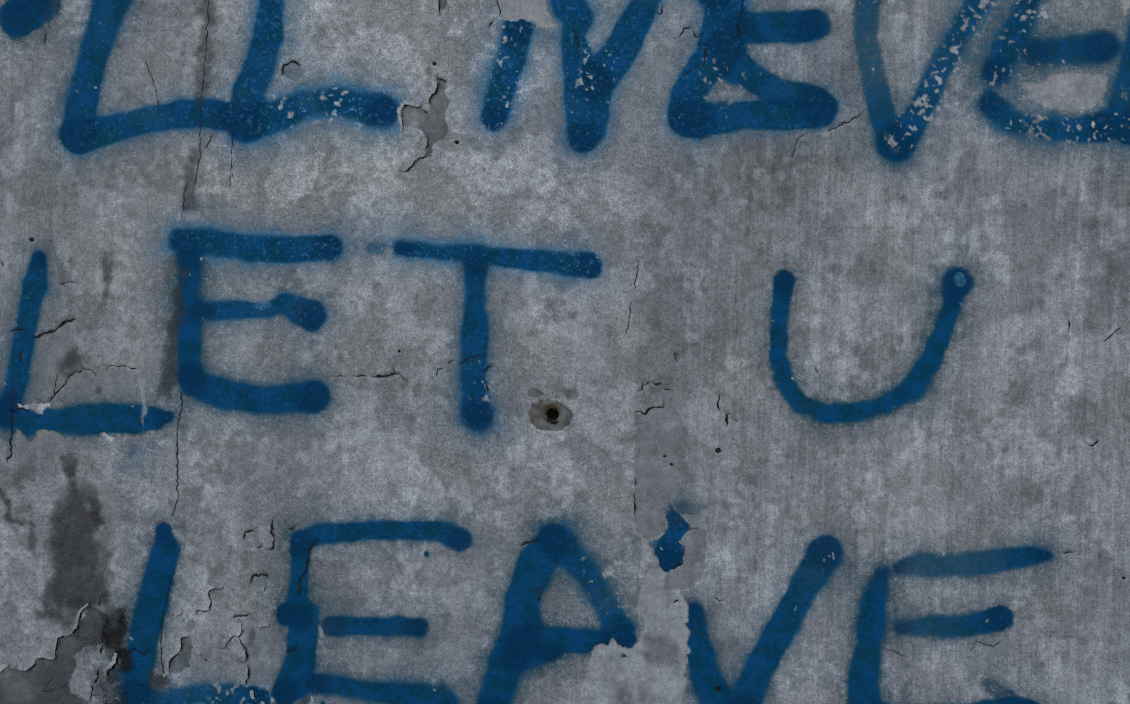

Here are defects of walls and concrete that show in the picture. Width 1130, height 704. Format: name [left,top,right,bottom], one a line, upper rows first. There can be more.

flaking render [433,0,447,16]
flaking render [497,0,555,28]
crack [181,2,233,218]
flaking render [397,62,459,172]
crack [7,319,75,461]
water stain [45,459,107,616]
flaking render [0,603,121,704]
water stain [103,614,133,672]